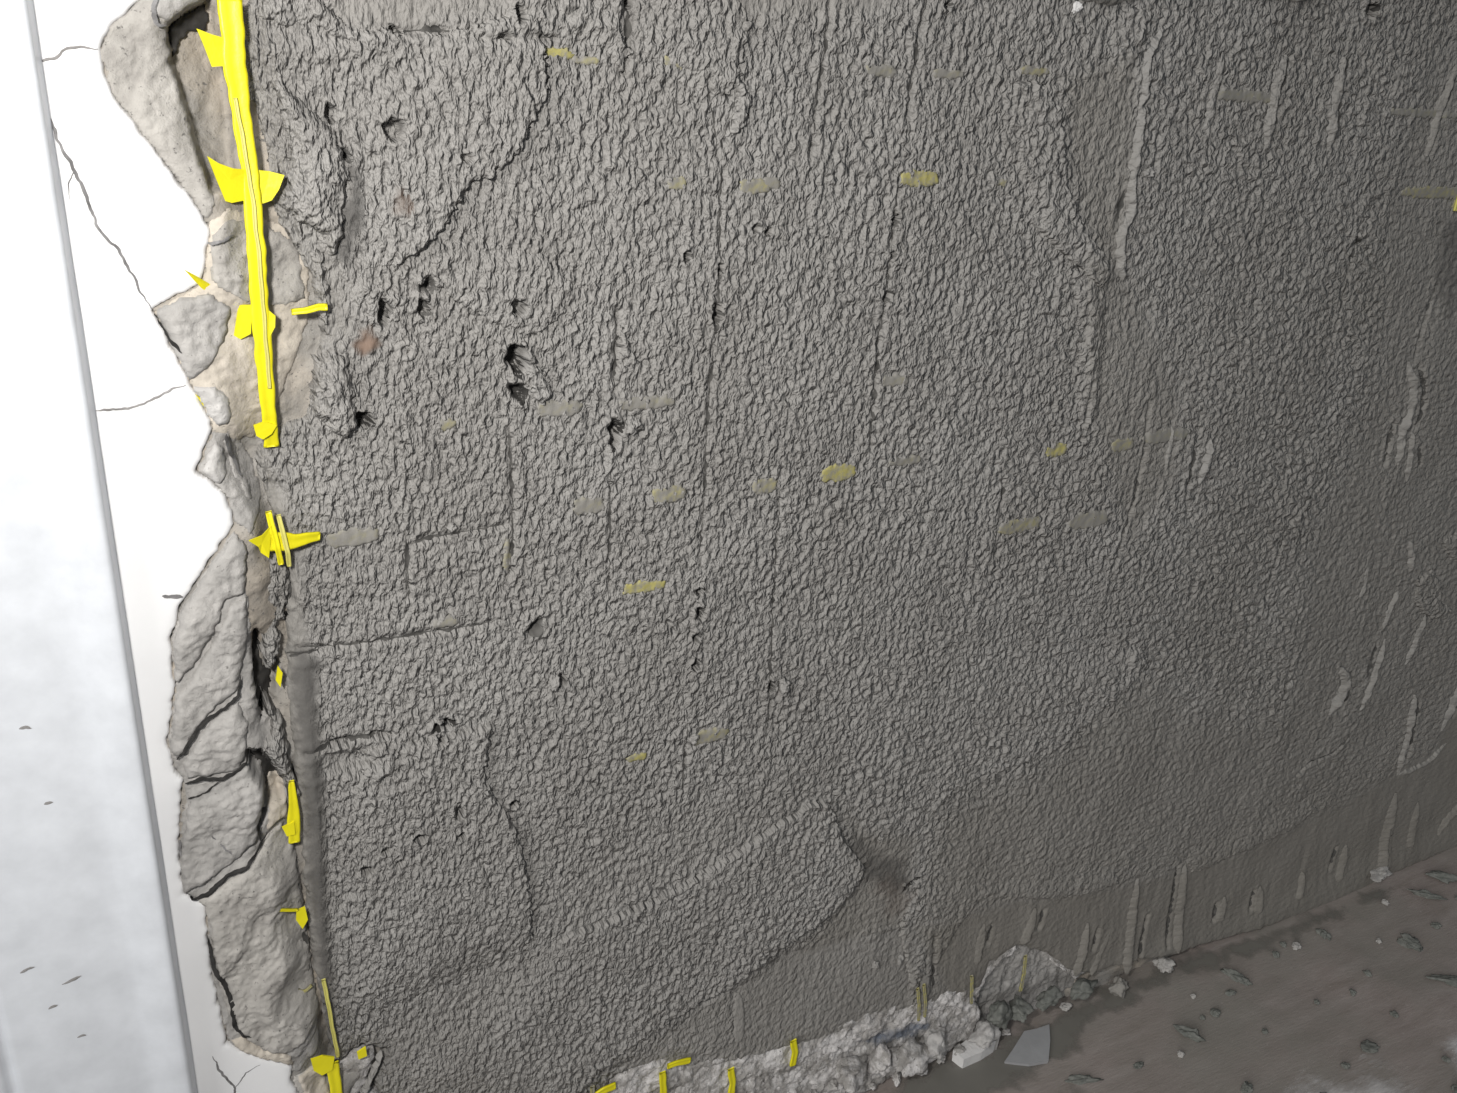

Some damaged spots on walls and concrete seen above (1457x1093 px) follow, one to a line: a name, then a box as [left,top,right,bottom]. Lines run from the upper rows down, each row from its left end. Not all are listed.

crack [42,45,96,62]
crack [151,0,167,27]
crack [623,9,632,62]
crack [51,119,185,411]
crack [700,94,723,546]
crack [869,194,897,451]
spalling [100,0,375,1093]
crack [177,676,255,799]
crack [306,730,392,754]
crack [178,783,310,971]
spalling [973,945,1085,1020]